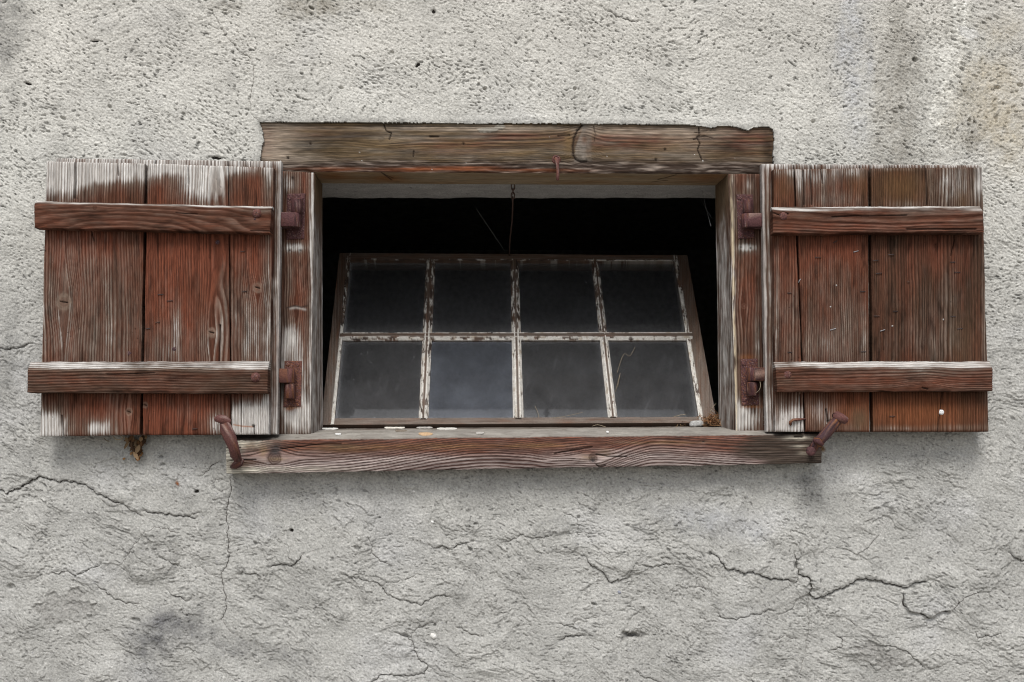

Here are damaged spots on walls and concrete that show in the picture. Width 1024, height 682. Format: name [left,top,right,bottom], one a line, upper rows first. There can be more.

crack [0,476,195,604]
crack [342,540,483,682]
crack [702,535,926,679]